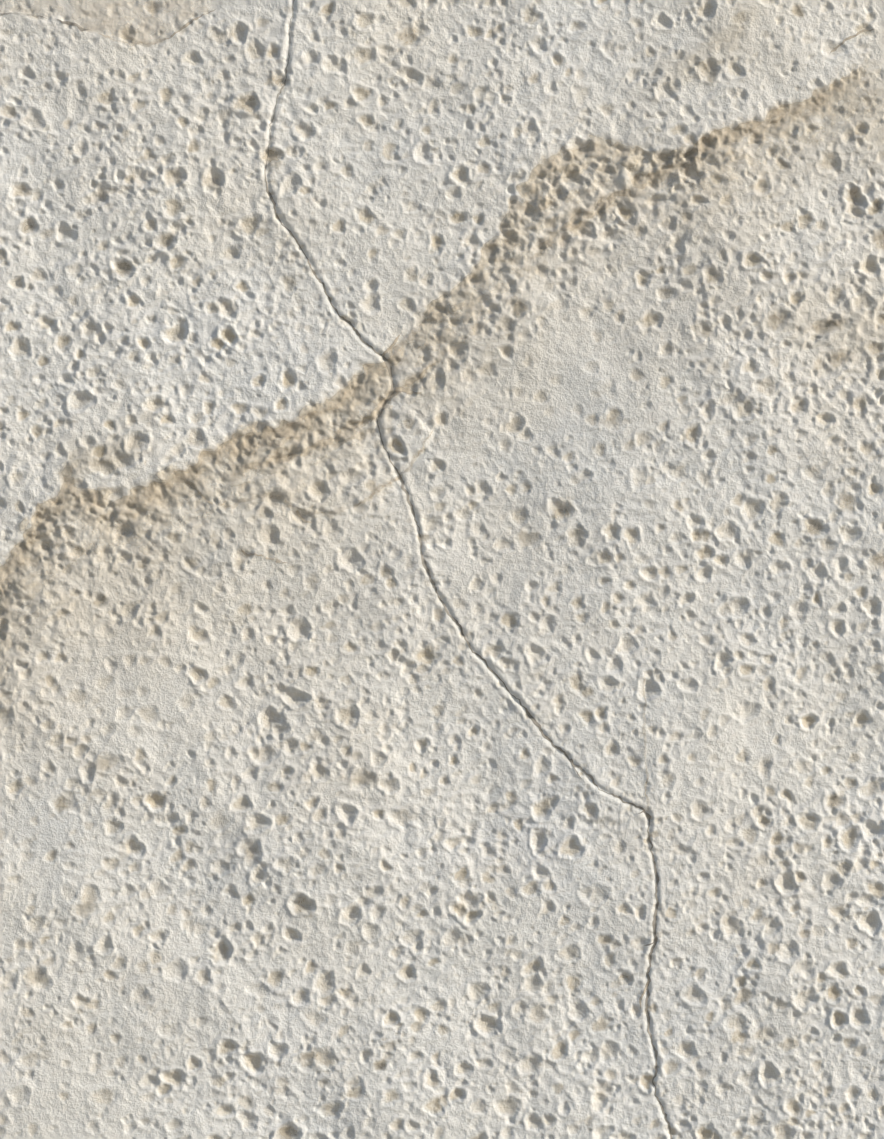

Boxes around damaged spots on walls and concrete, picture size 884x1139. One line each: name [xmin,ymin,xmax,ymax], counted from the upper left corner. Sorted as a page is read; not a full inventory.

flaking render [40,0,153,46]
flaking render [415,69,864,344]
crack [173,475,212,504]
flaking render [0,348,425,624]
crack [265,158,672,1139]